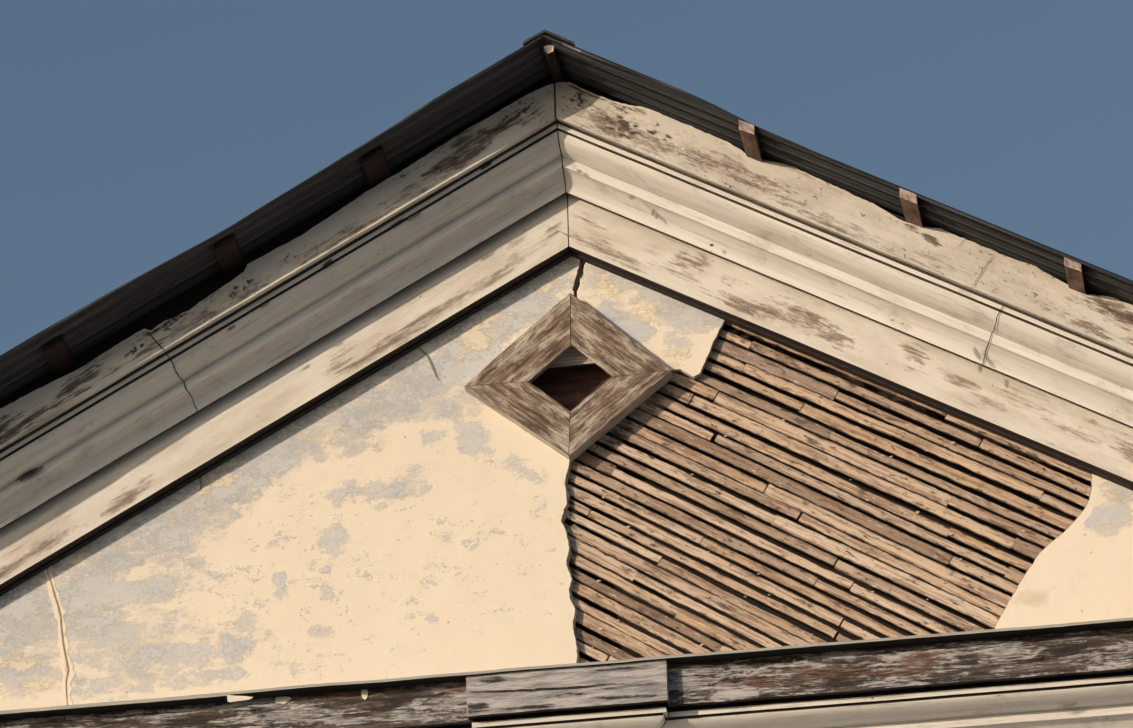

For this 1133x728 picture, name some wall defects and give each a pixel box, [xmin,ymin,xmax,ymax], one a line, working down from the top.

peeling [228,98,542,297]
peeling [561,85,826,219]
crack [147,330,199,412]
crack [982,306,1003,365]
flaking render [0,261,1133,700]
crack [43,565,75,706]
peeling [138,709,186,725]
peeling [227,689,467,726]